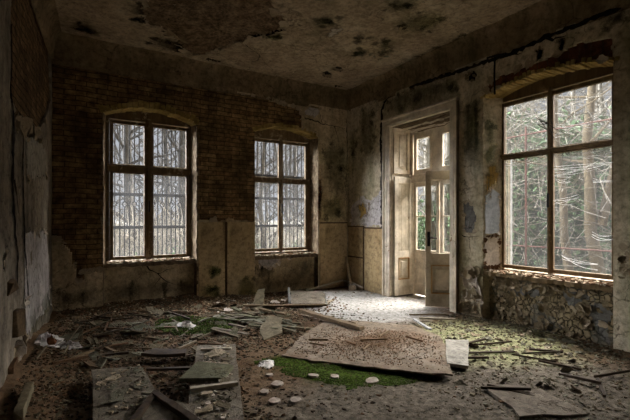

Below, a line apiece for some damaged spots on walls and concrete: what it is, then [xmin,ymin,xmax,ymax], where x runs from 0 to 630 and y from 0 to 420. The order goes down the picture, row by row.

crack [409,8,621,89]
spalling [482,38,615,94]
spalling [11,0,322,362]
peeling [456,186,613,344]